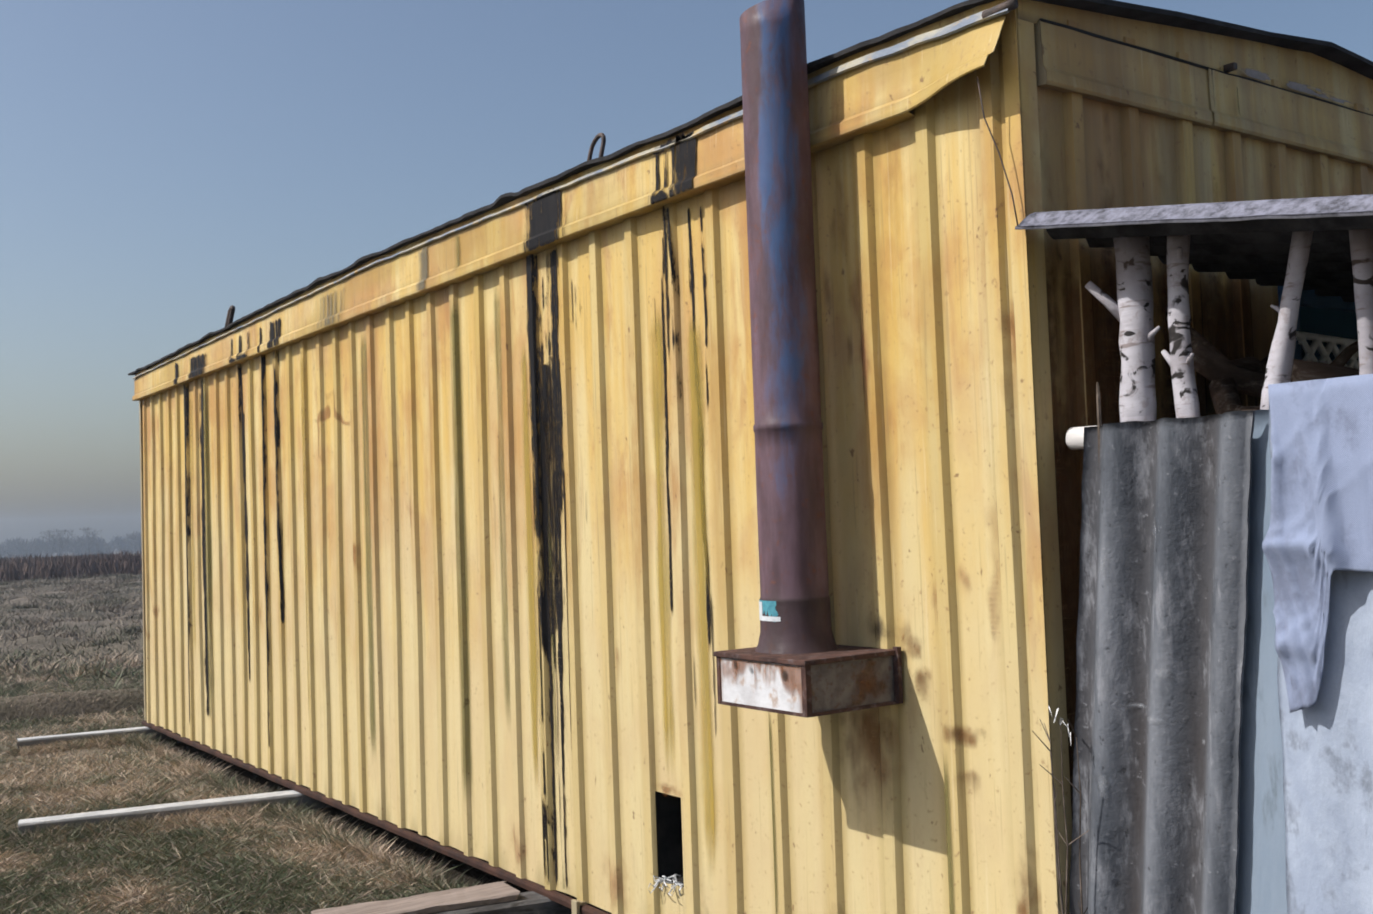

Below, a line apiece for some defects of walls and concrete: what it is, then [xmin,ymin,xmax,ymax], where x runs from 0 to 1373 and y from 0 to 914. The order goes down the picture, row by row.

damp [183,379,211,723]
damp [229,333,285,745]
damp [526,219,576,887]
damp [648,132,716,734]
rust [720,658,802,700]